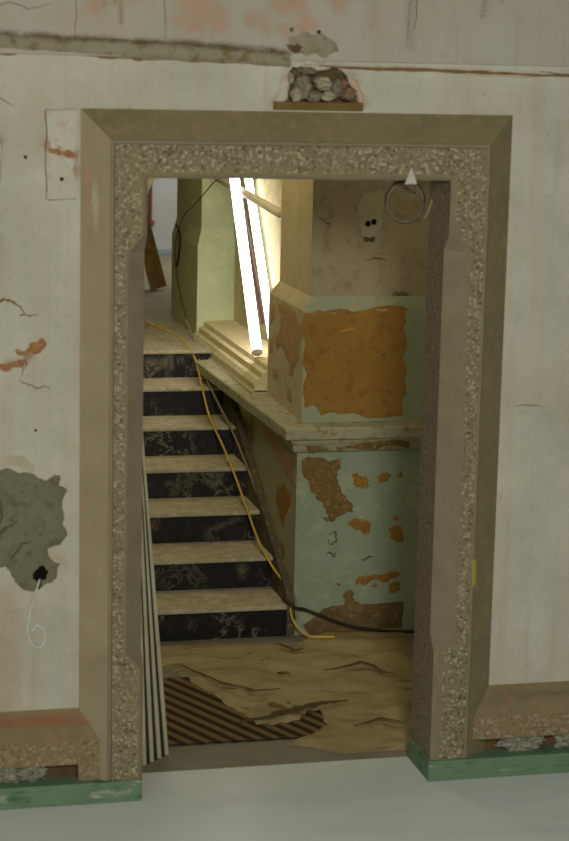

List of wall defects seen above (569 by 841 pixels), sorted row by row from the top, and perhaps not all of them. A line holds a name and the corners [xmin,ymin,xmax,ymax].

spalling [265,27,371,111]
peeling [270,302,408,418]
peeling [261,422,409,535]
peeling [303,571,404,635]